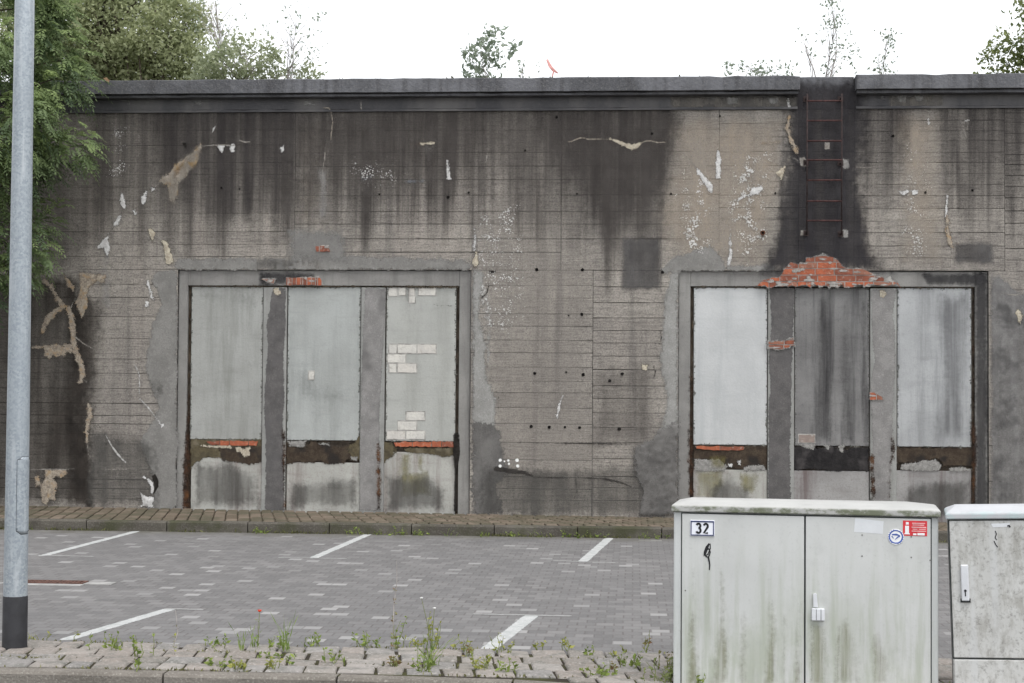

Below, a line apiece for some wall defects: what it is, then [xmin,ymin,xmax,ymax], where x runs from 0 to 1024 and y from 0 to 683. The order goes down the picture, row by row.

water stain [94,97,457,243]
water stain [472,82,876,271]
peeling [43,270,106,318]
flaking render [388,287,437,304]
flaking render [387,343,437,373]
flaking render [694,253,972,501]
flaking render [386,411,454,447]
spalling [35,468,68,506]
water stain [214,466,243,504]
water stain [293,485,306,505]
water stain [391,480,440,508]
water stain [522,472,578,515]